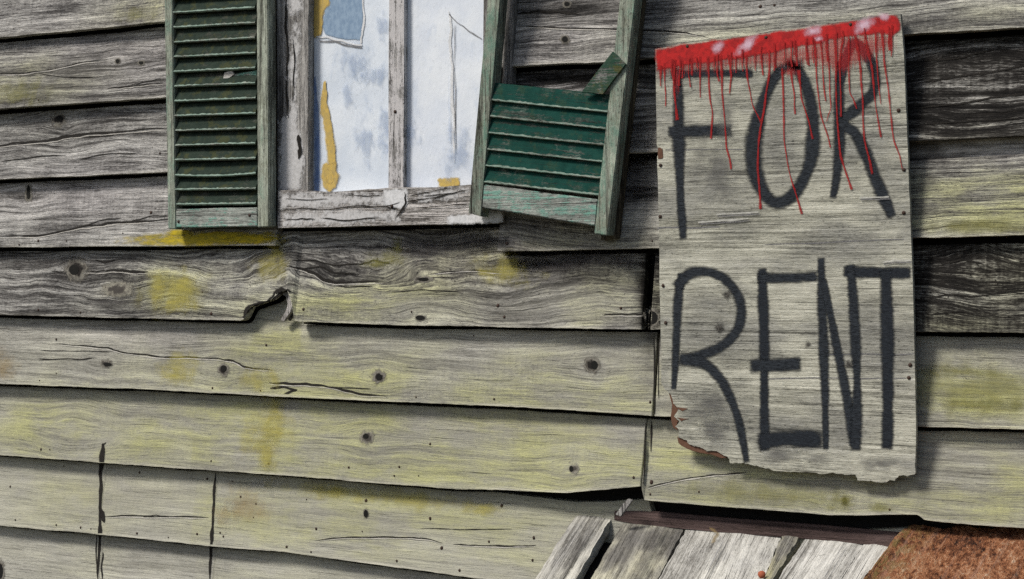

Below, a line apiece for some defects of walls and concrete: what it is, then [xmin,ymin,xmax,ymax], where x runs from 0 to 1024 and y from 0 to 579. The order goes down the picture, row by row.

damp [135,229,277,246]
crack [42,343,386,398]
crack [95,442,216,579]